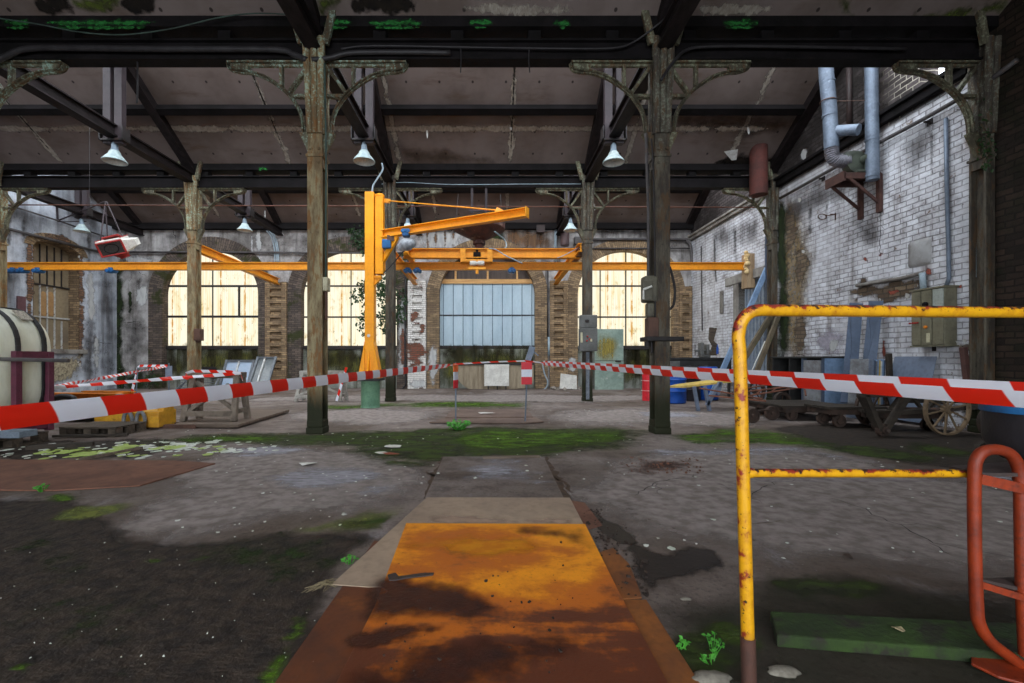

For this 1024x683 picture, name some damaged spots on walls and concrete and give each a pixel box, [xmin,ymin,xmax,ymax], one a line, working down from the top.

leakage [103,282,111,340]
peeling [784,198,814,356]
spalling [848,268,931,303]
leakage [85,337,95,378]
peeling [398,301,437,388]